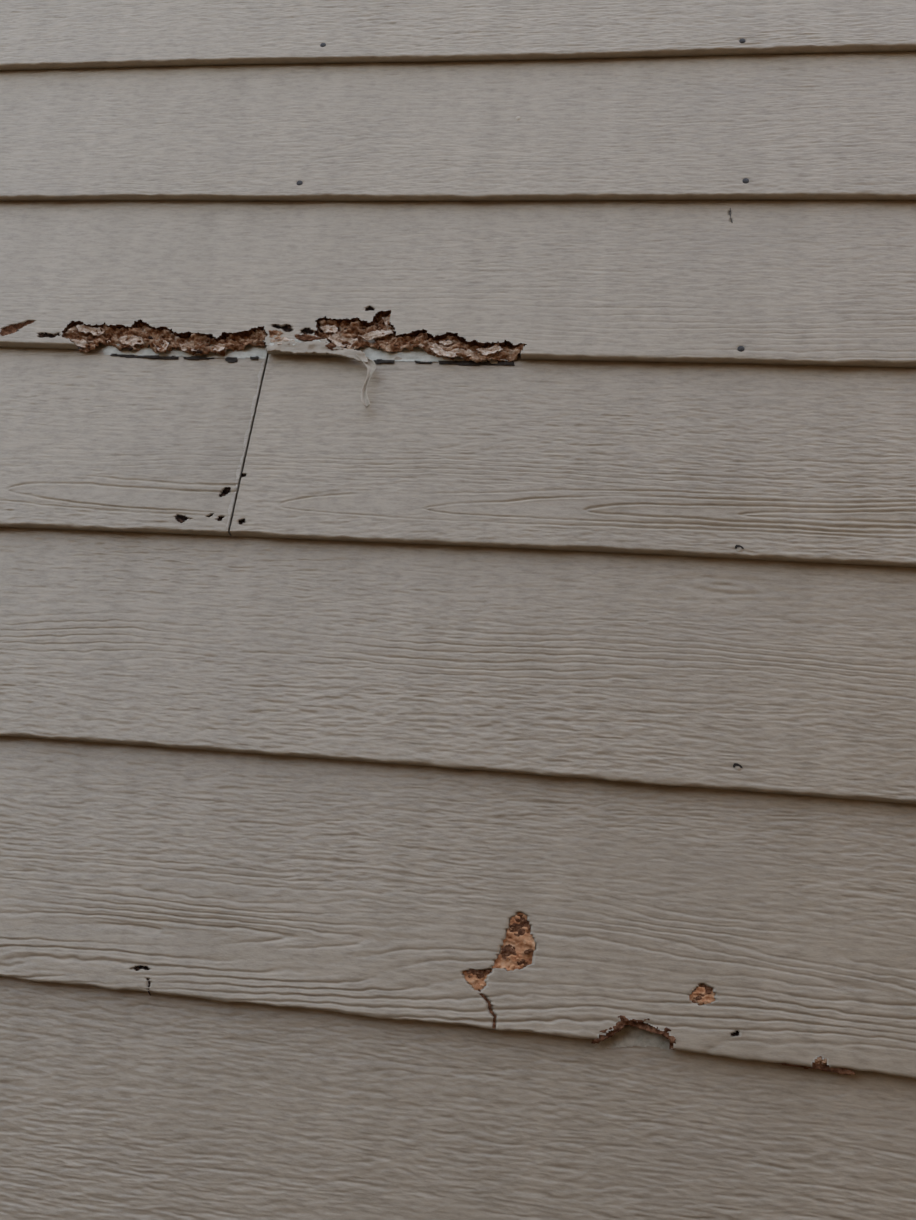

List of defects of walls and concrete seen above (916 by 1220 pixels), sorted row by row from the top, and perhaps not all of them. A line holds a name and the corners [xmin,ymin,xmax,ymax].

spalling [0,320,105,349]
peeling [119,335,226,352]
peeling [267,306,393,408]
peeling [427,340,503,358]
peeling [463,912,535,990]
peeling [689,984,715,1005]
spalling [591,1015,676,1050]